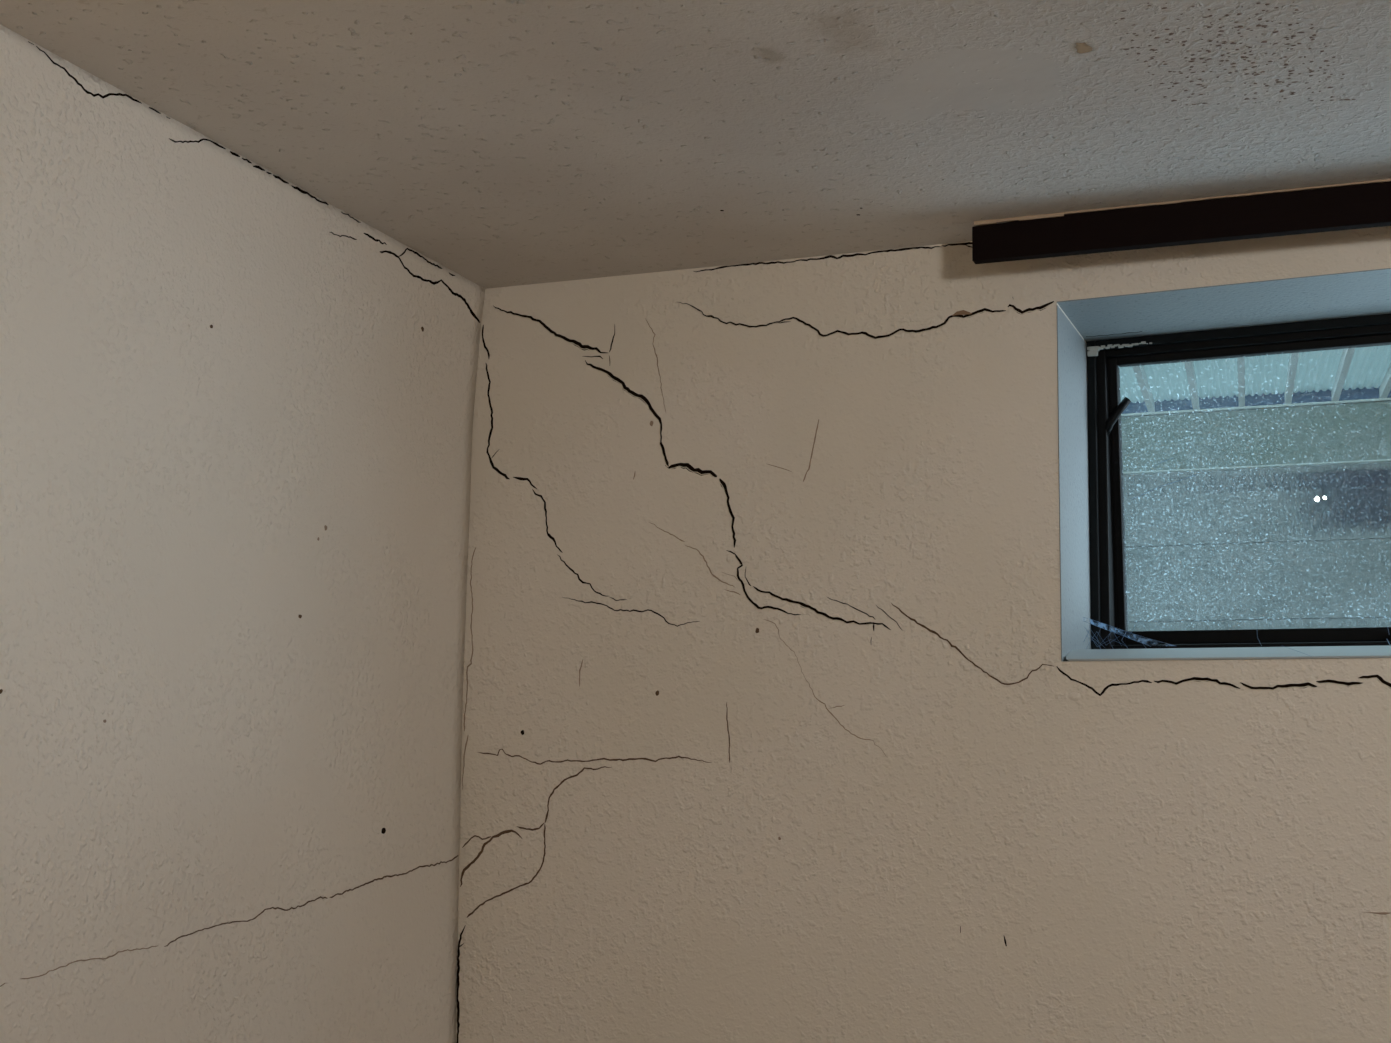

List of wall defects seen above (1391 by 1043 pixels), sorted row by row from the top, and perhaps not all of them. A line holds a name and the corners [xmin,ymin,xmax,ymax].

crack [28,41,1391,758]
crack [0,548,730,1043]